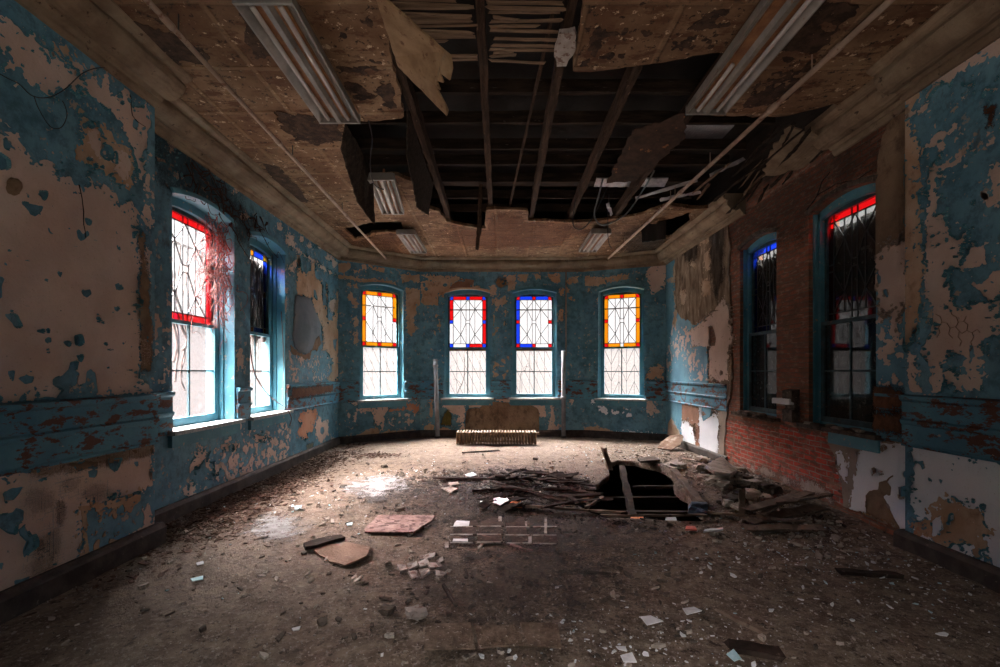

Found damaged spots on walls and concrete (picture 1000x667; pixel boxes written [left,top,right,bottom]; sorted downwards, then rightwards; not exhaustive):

damp [274,111,342,146]
damp [336,59,397,111]
peeling [0,15,184,403]
peeling [874,38,1000,398]
flaking render [266,211,630,382]
peeling [179,407,335,498]
flaking render [347,399,560,436]
peeling [583,399,653,433]
flaking render [645,226,1000,620]
peeling [0,445,155,591]
peeling [536,595,787,667]